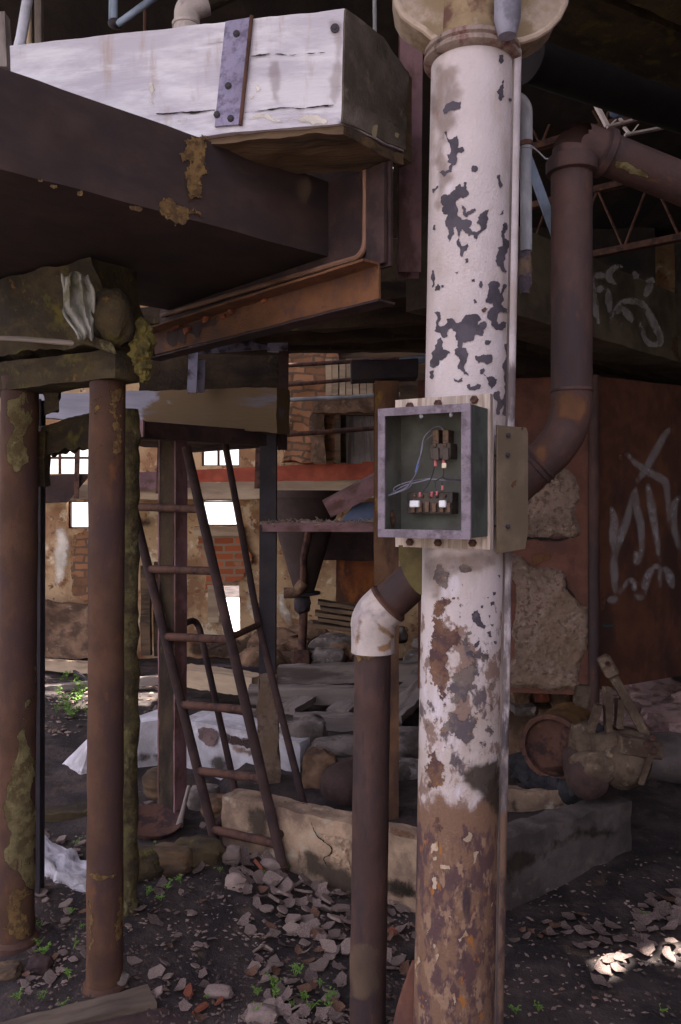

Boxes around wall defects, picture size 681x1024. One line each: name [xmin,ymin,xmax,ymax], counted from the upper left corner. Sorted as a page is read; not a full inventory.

peeling [443,101,461,114]
peeling [430,131,509,416]
spalling [527,468,581,539]
rust [356,624,394,662]
rust [429,597,461,707]
spalling [498,554,588,692]
rust [424,750,445,802]
crack [311,823,349,870]